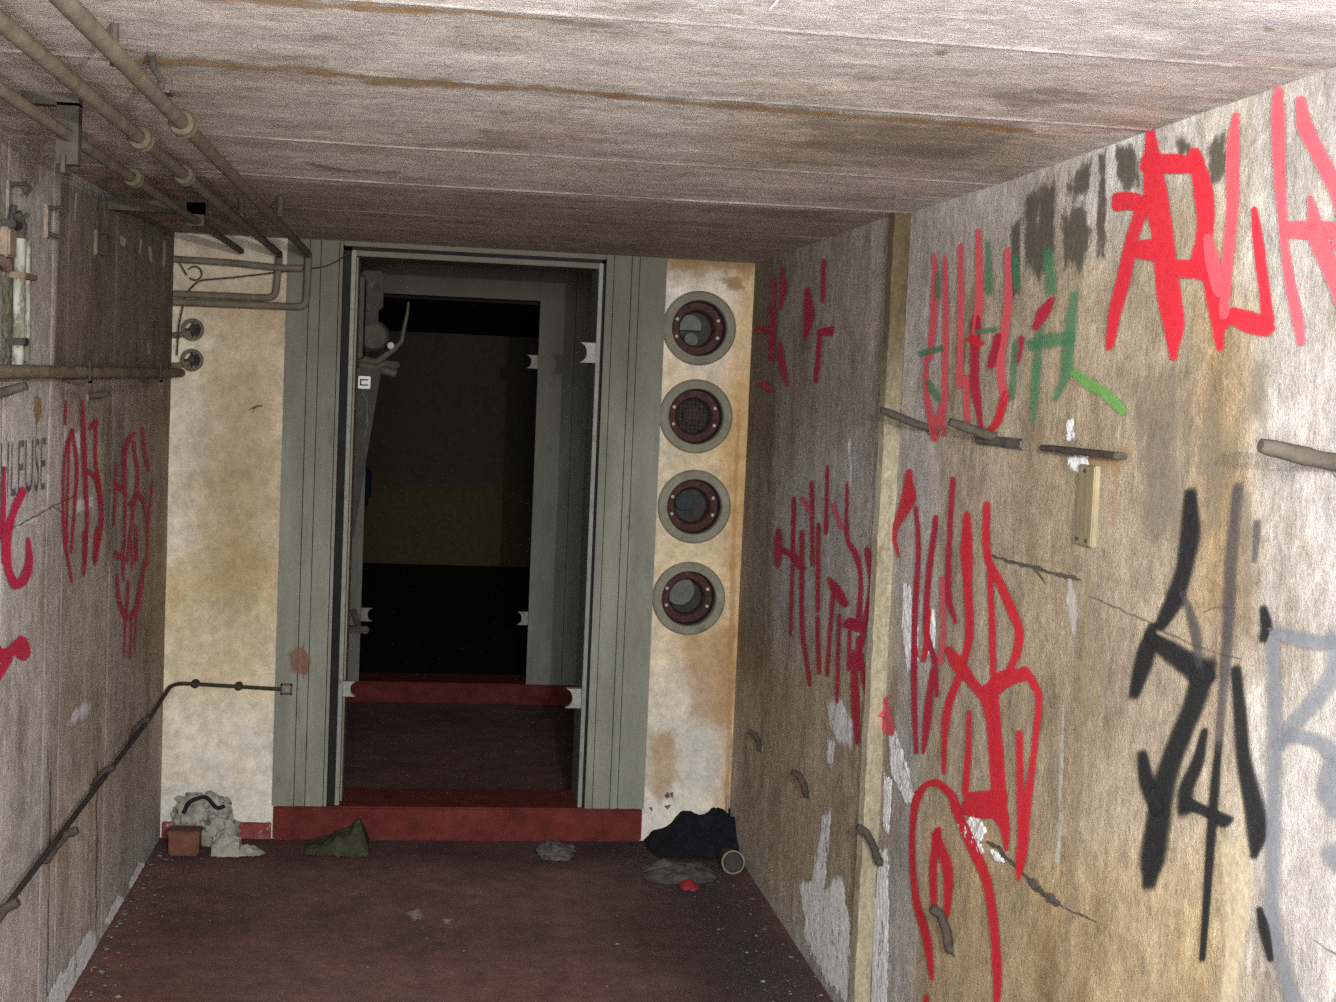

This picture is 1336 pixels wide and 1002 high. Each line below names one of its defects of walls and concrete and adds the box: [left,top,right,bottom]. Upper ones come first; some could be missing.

crack [0,496,74,539]